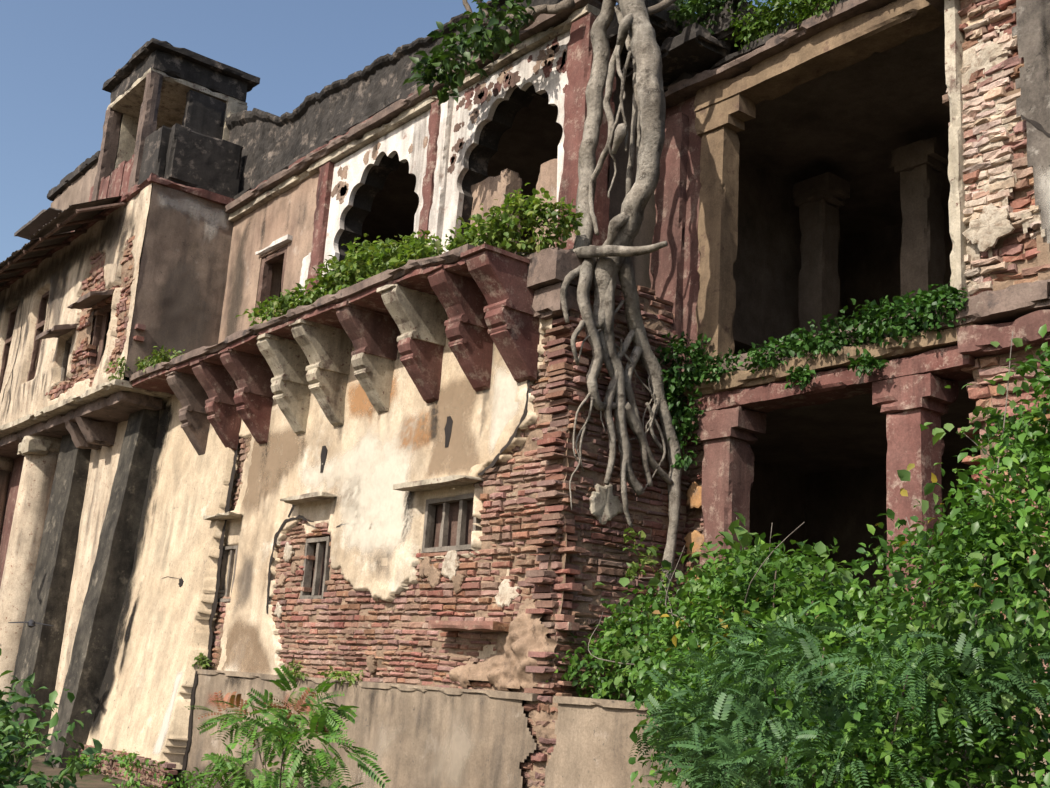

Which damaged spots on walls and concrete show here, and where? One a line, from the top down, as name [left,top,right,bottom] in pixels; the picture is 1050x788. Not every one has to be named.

peeling [447,37,569,174]
peeling [948,0,1047,295]
flaking render [45,231,146,400]
damp [113,601,136,667]
damp [154,673,182,753]
flaking render [270,327,623,788]